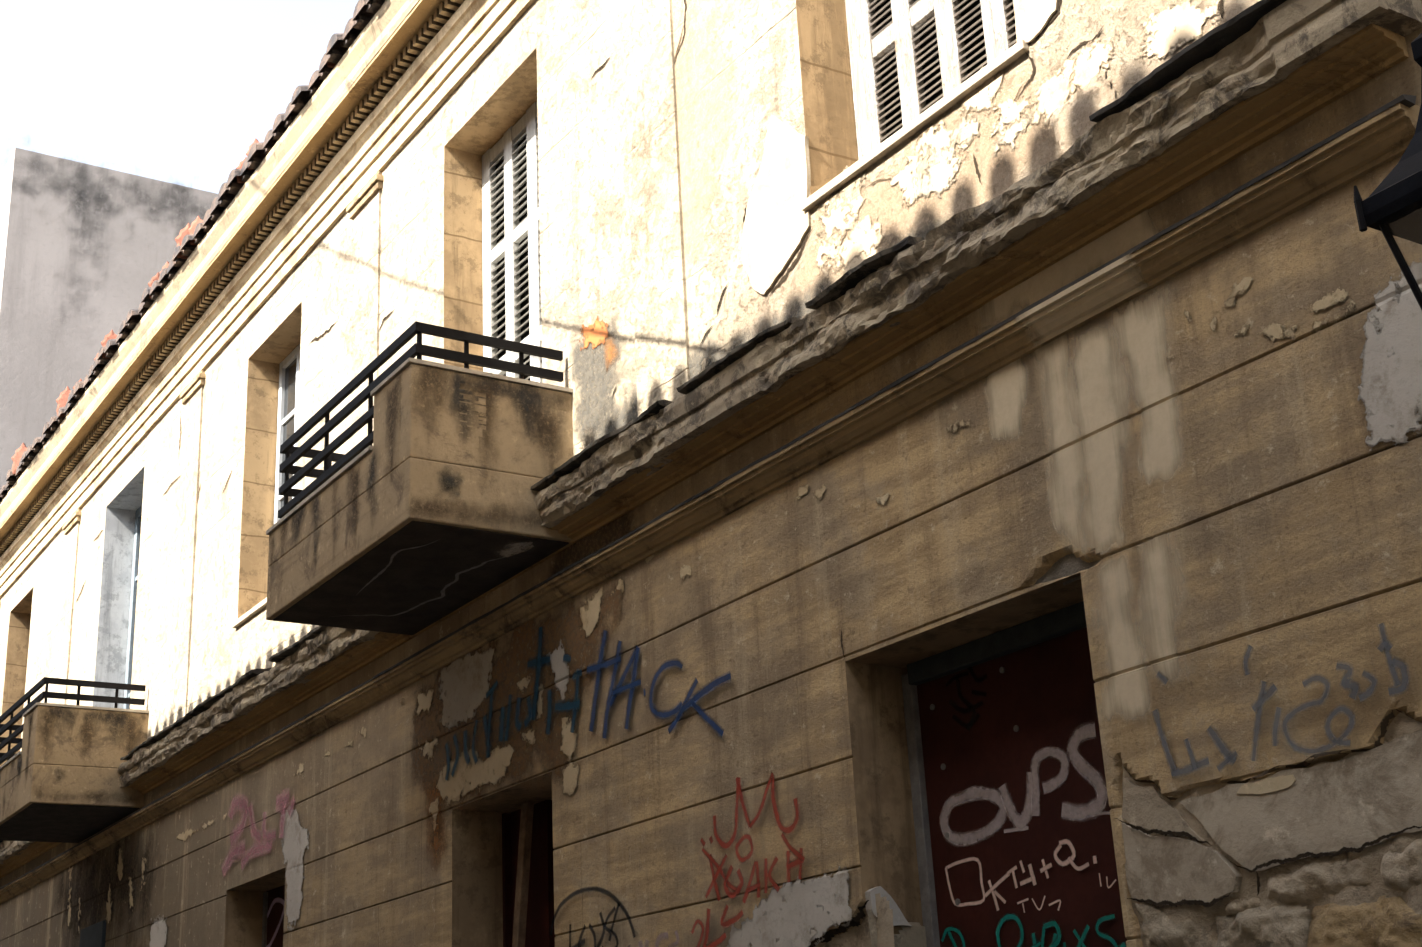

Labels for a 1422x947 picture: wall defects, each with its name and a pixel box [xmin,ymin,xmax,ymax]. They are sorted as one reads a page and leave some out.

crack [674,0,687,64]
peeling [1013,0,1059,44]
peeling [1136,0,1222,60]
peeling [742,31,1120,295]
water stain [272,498,319,551]
water stain [349,377,399,532]
crack [333,552,522,617]
water stain [419,328,638,458]
water stain [689,285,829,379]
water stain [982,210,1181,720]
peeling [400,579,624,840]
spalling [1115,712,1422,947]